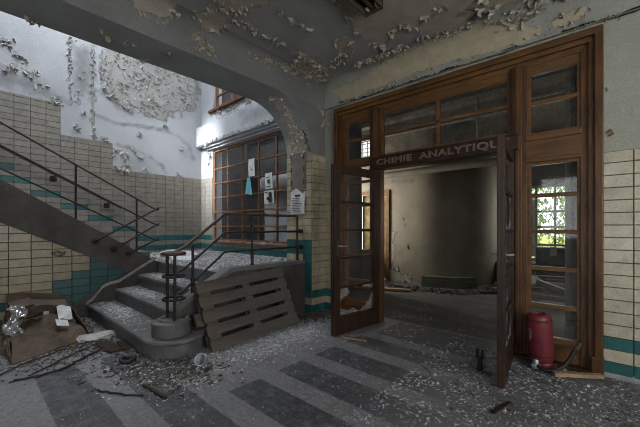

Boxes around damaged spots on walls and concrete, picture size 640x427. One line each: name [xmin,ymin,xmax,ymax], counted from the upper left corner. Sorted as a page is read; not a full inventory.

peeling [0,36,51,89]
peeling [47,28,201,142]
peeling [132,0,181,25]
peeling [190,0,591,104]
peeling [200,95,311,177]